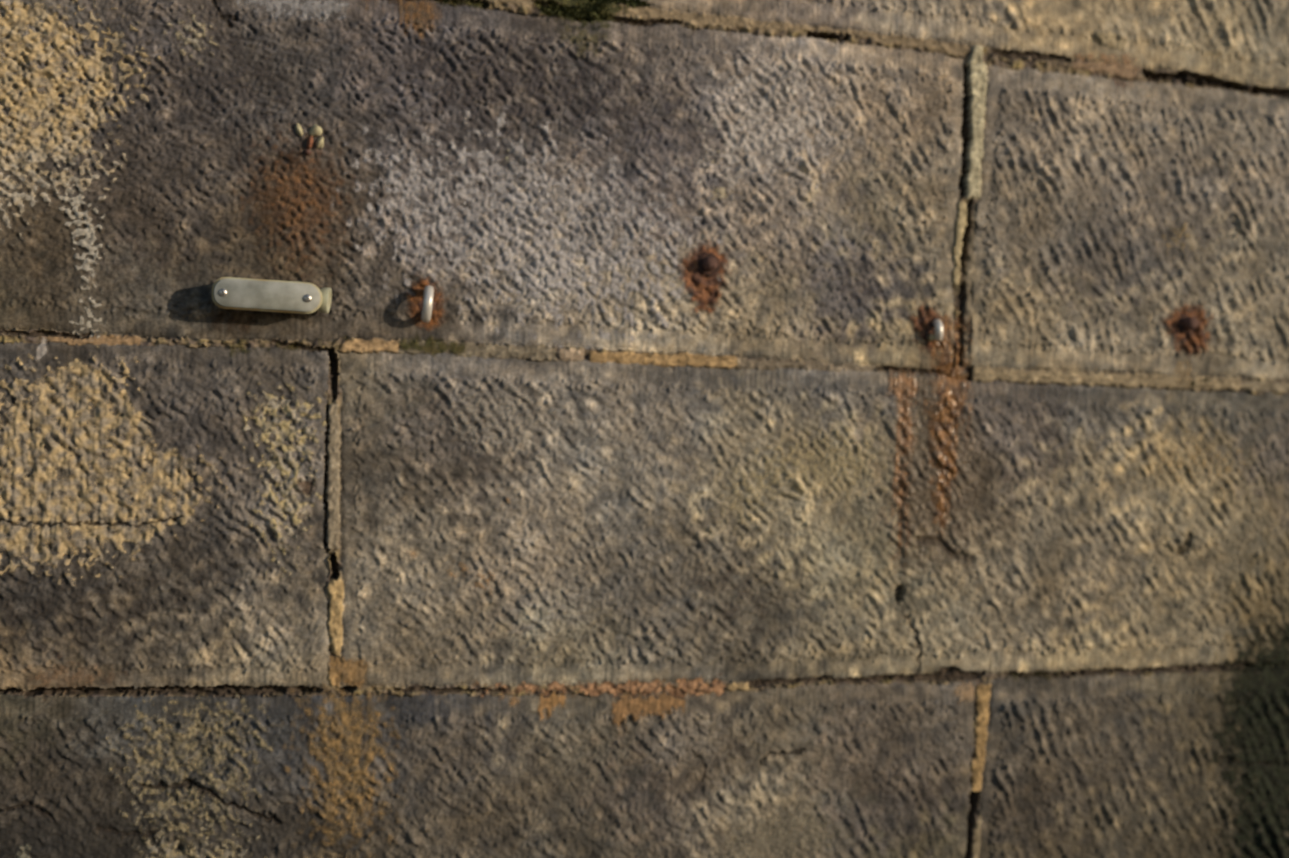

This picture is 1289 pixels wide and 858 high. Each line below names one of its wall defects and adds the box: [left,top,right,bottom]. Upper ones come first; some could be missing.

corrosion [407,278,443,327]
corrosion [683,245,727,313]
corrosion [1166,305,1213,356]
corrosion [889,305,973,548]
crack [0,516,182,527]